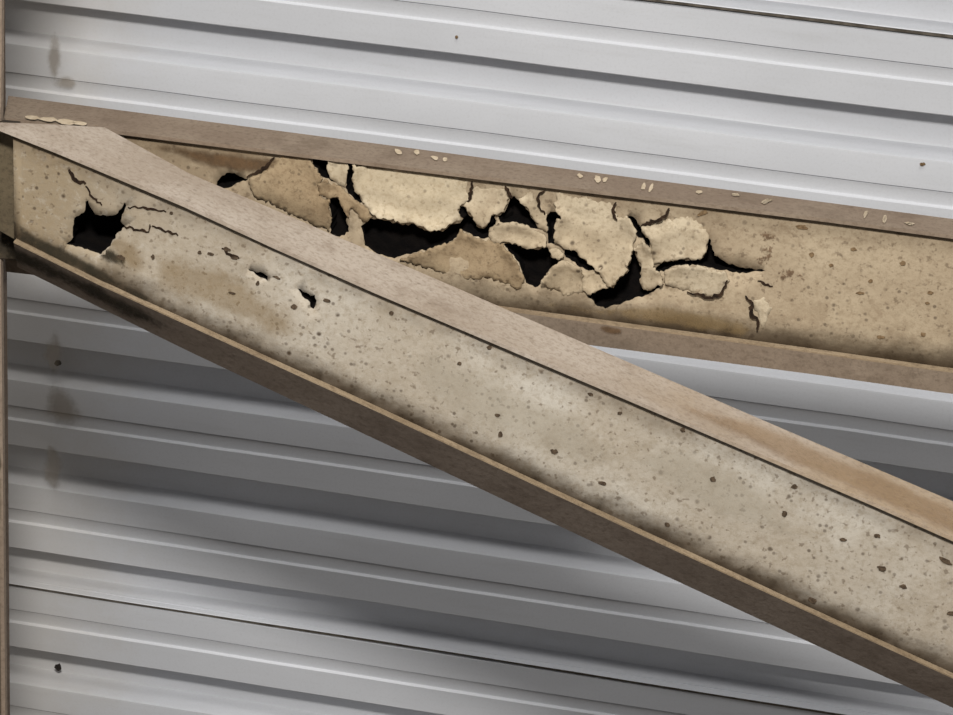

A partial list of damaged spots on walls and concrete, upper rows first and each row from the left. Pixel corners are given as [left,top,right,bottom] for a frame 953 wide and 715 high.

crack [68,169,102,206]
crack [124,206,178,236]
peeling [248,155,730,297]
peeling [753,297,772,329]